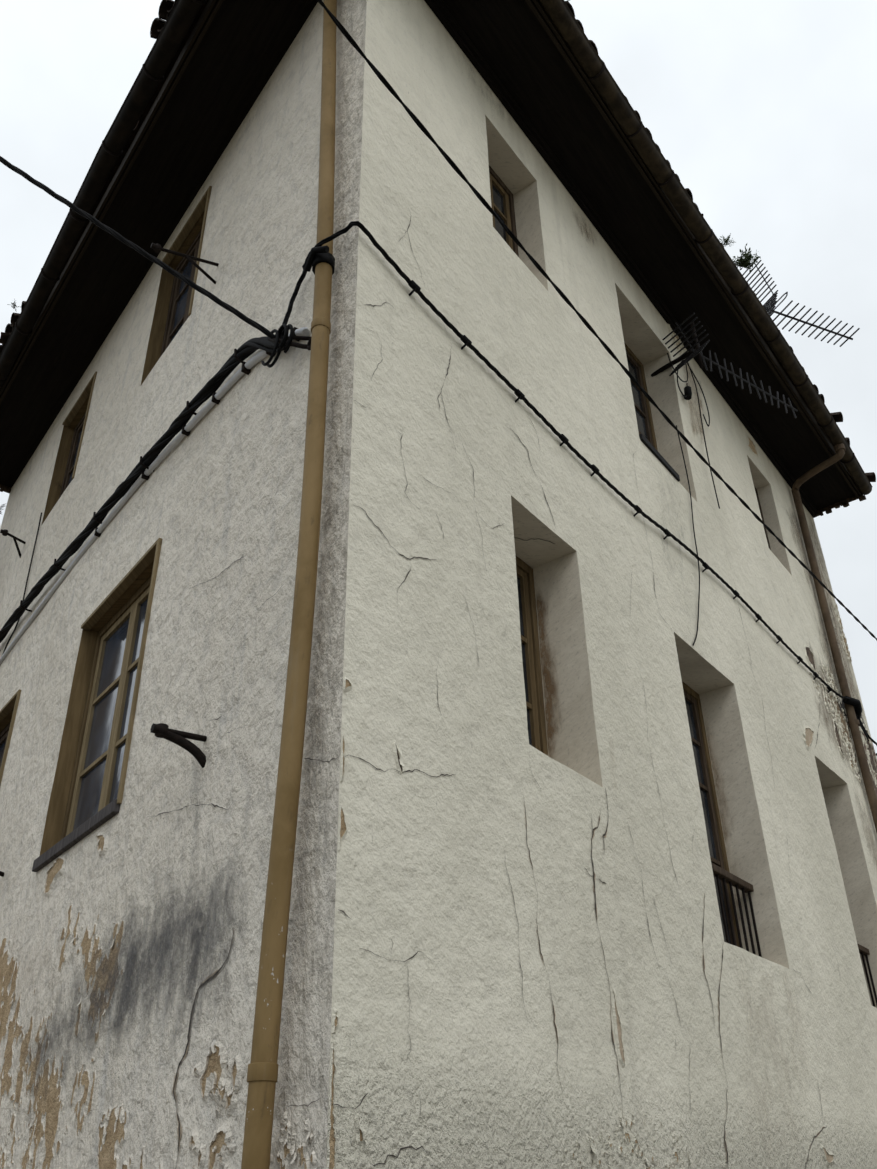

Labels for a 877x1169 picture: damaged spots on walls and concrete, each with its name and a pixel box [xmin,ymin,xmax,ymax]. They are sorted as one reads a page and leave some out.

crack [352,356,555,591]
damp [792,518,864,777]
flaking render [44,854,66,898]
flaking render [0,892,163,1169]
damp [38,905,210,1064]
crack [172,927,234,1165]
flaking render [189,1038,244,1169]
peeling [269,1007,339,1169]
crack [370,1146,431,1166]
crack [504,761,563,1092]
peeling [555,1110,693,1169]
crack [585,689,728,1163]